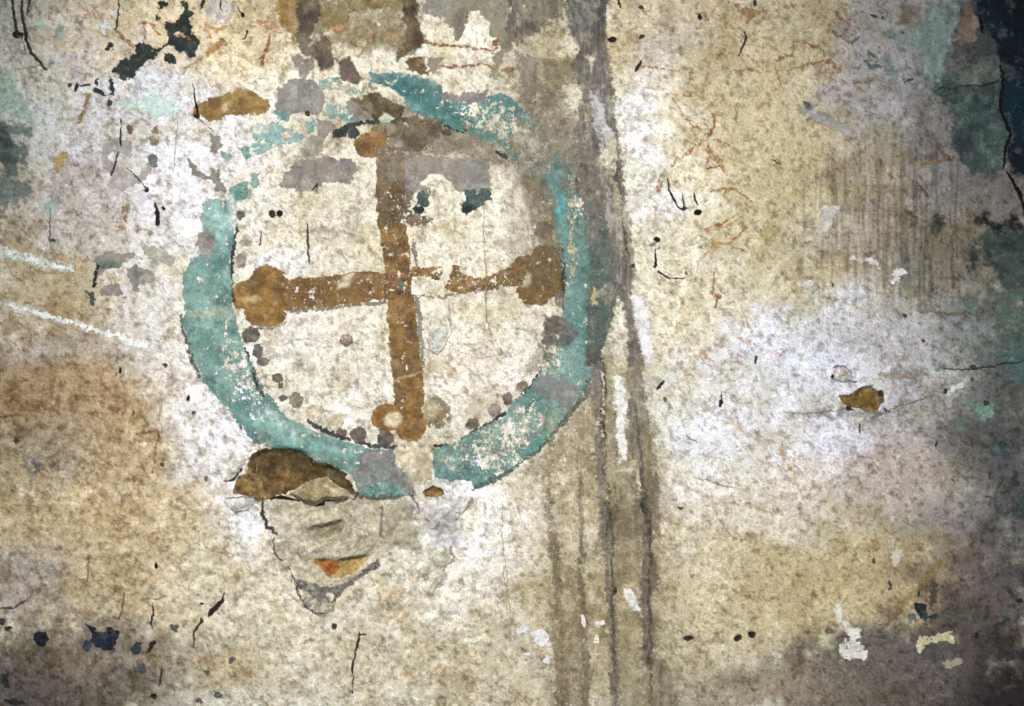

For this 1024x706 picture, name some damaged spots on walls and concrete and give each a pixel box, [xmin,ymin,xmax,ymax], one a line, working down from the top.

damp [292,0,666,706]
crack [905,65,1024,215]